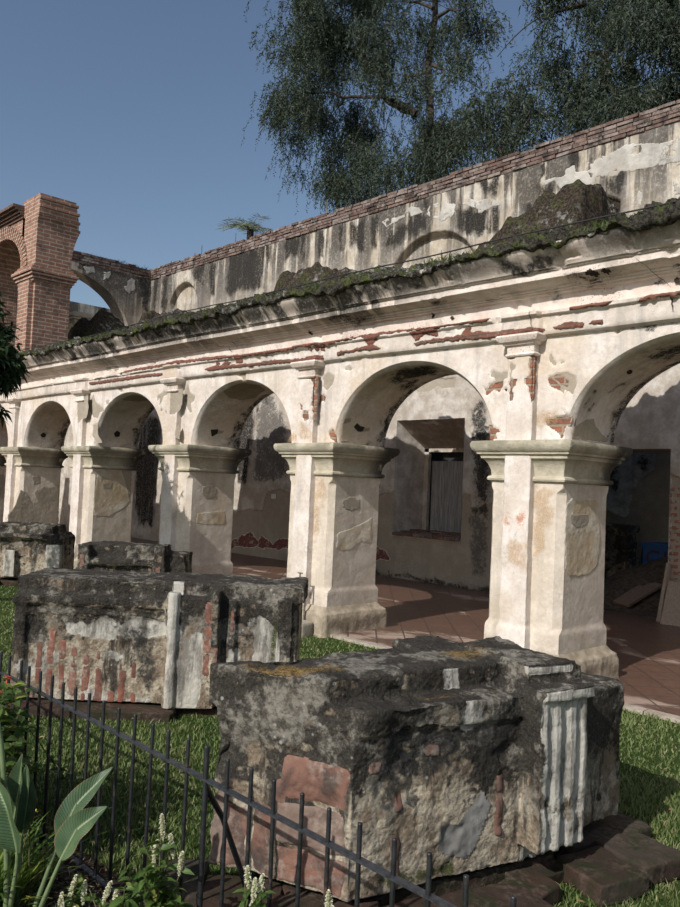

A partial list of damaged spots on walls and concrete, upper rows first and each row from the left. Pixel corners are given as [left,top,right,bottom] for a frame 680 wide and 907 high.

flaking render [542,138,680,188]
leakage [339,199,428,252]
leakage [457,176,499,236]
leakage [499,256,552,276]
flaking render [569,301,612,310]
flaking render [638,291,680,303]
flaking render [77,318,609,444]
leakage [132,406,161,527]
leakage [229,395,287,484]
leakage [468,401,491,574]
flaking render [231,489,291,561]
flaking render [375,490,493,592]